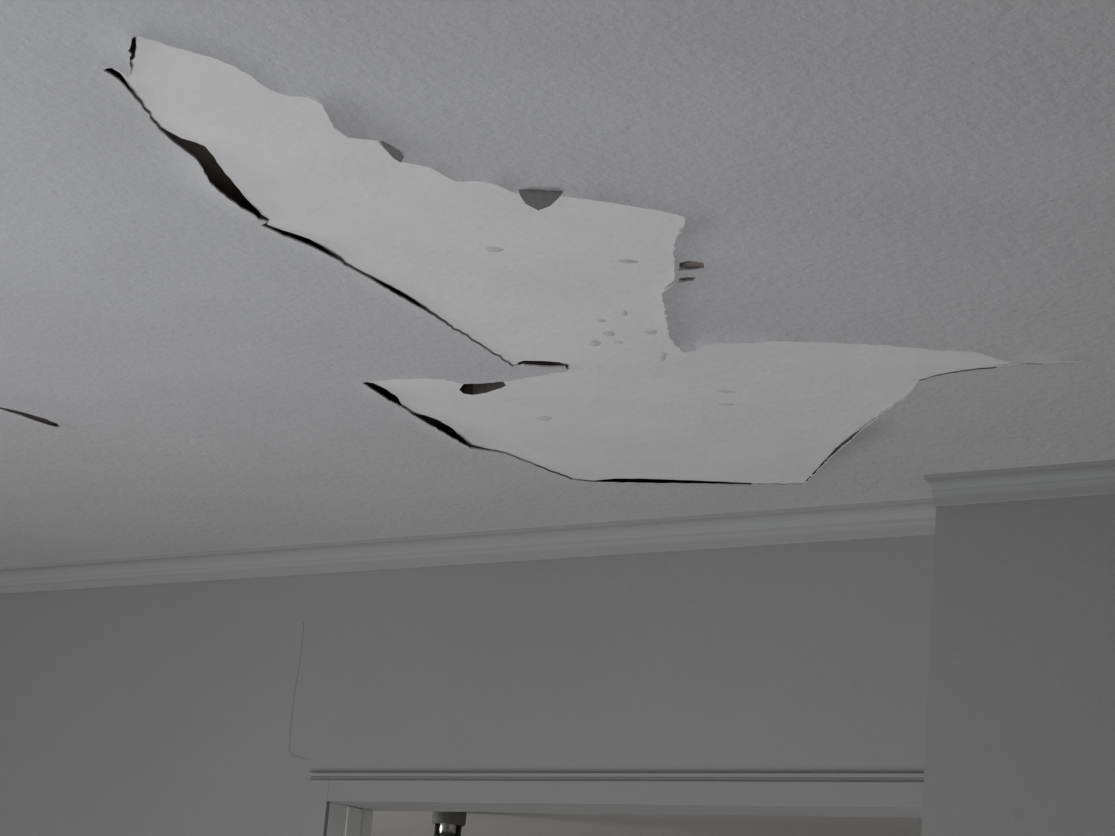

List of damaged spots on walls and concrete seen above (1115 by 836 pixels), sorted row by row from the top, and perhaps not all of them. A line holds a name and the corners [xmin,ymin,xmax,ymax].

crack [0,405,83,431]
peeling [82,13,1104,489]